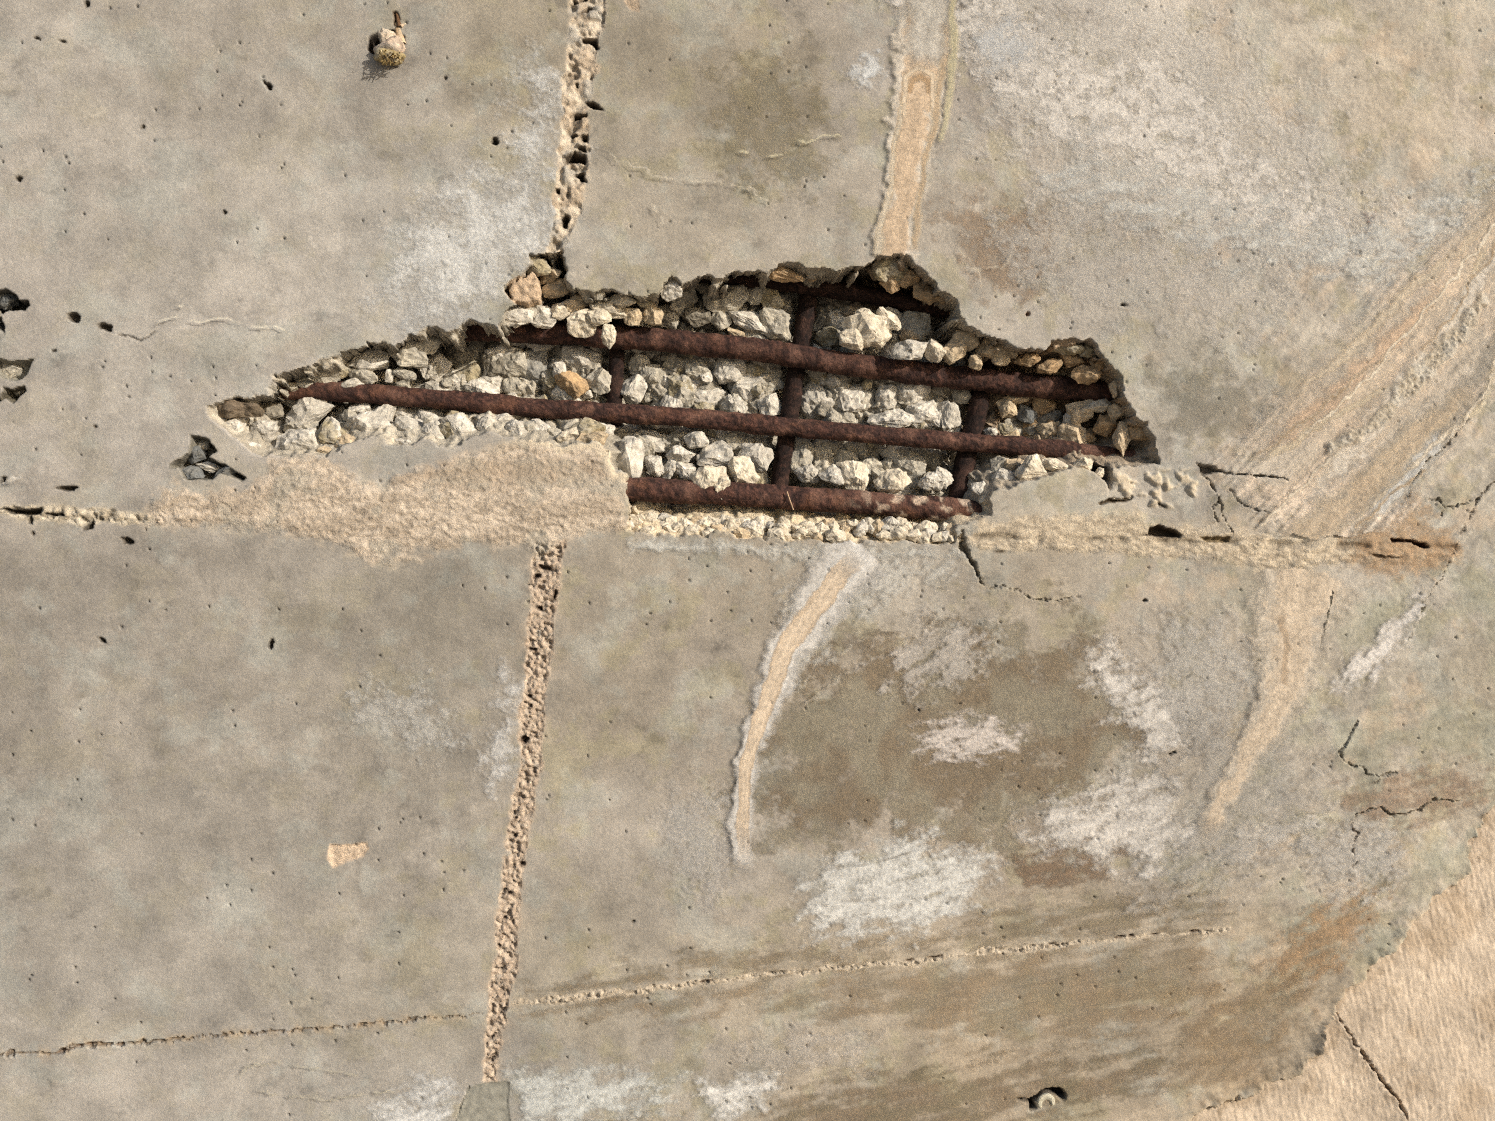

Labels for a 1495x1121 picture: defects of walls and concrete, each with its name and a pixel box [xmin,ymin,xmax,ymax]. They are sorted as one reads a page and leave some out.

damp [850,0,1495,540]
spalling [207,250,1161,545]
crack [1196,462,1287,534]
crack [1406,420,1495,641]
damp [632,539,1488,995]
crack [1337,720,1494,869]
crack [0,1012,483,1101]
damp [505,1065,668,1121]
damp [696,1022,1164,1121]
crack [1313,1012,1409,1121]